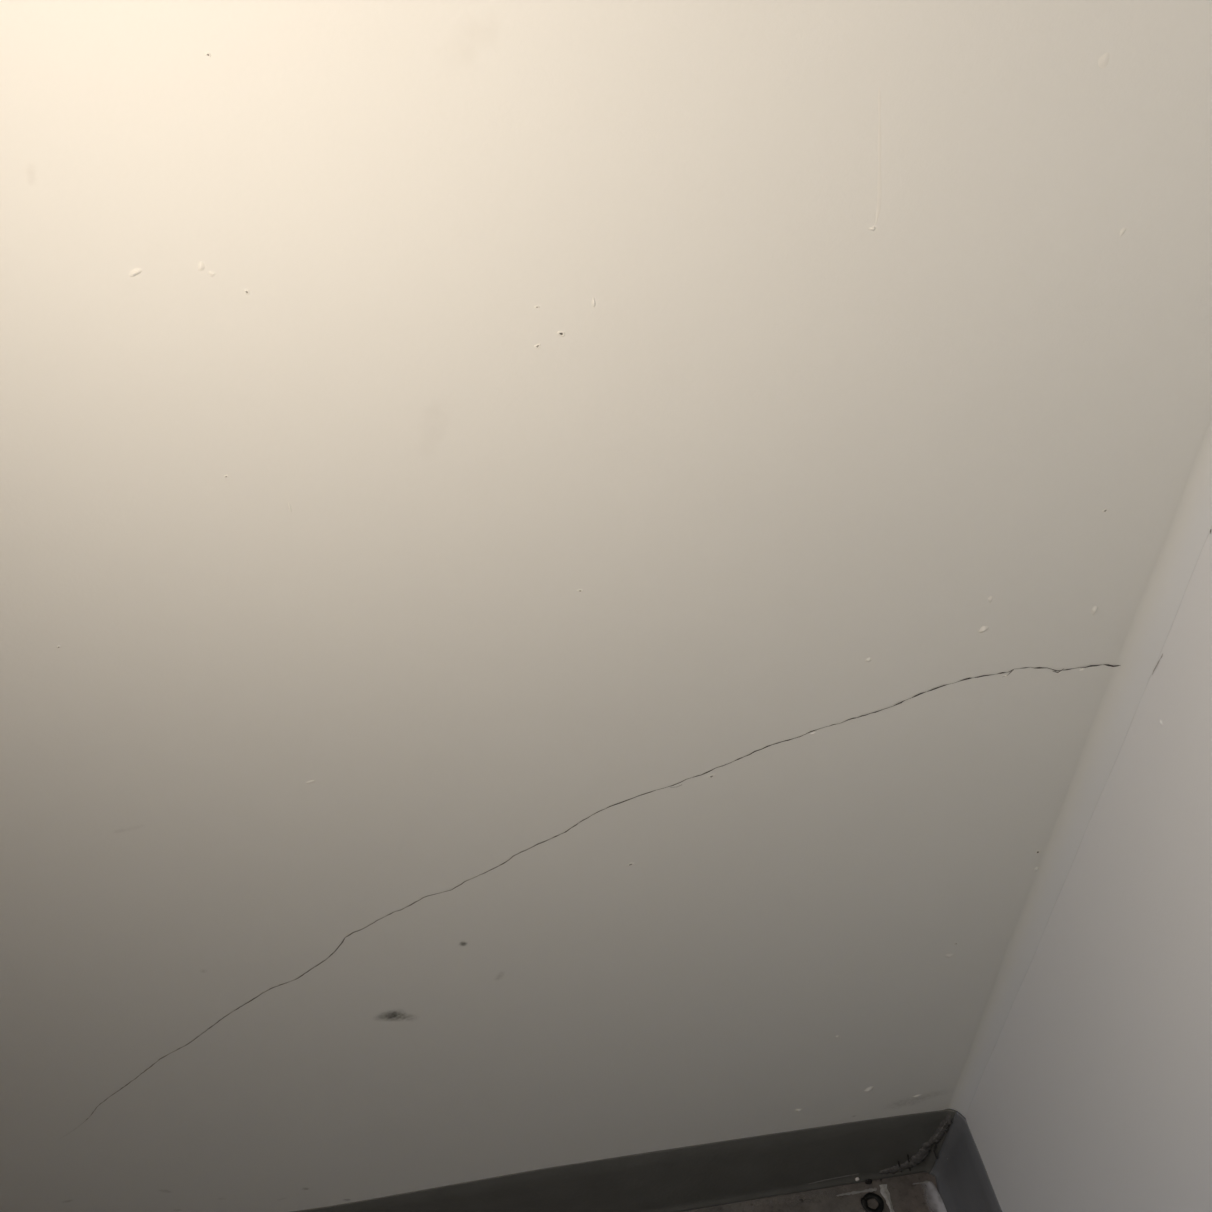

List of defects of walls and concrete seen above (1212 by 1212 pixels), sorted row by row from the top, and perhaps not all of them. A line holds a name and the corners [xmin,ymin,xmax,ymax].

crack [83,664,1121,1123]